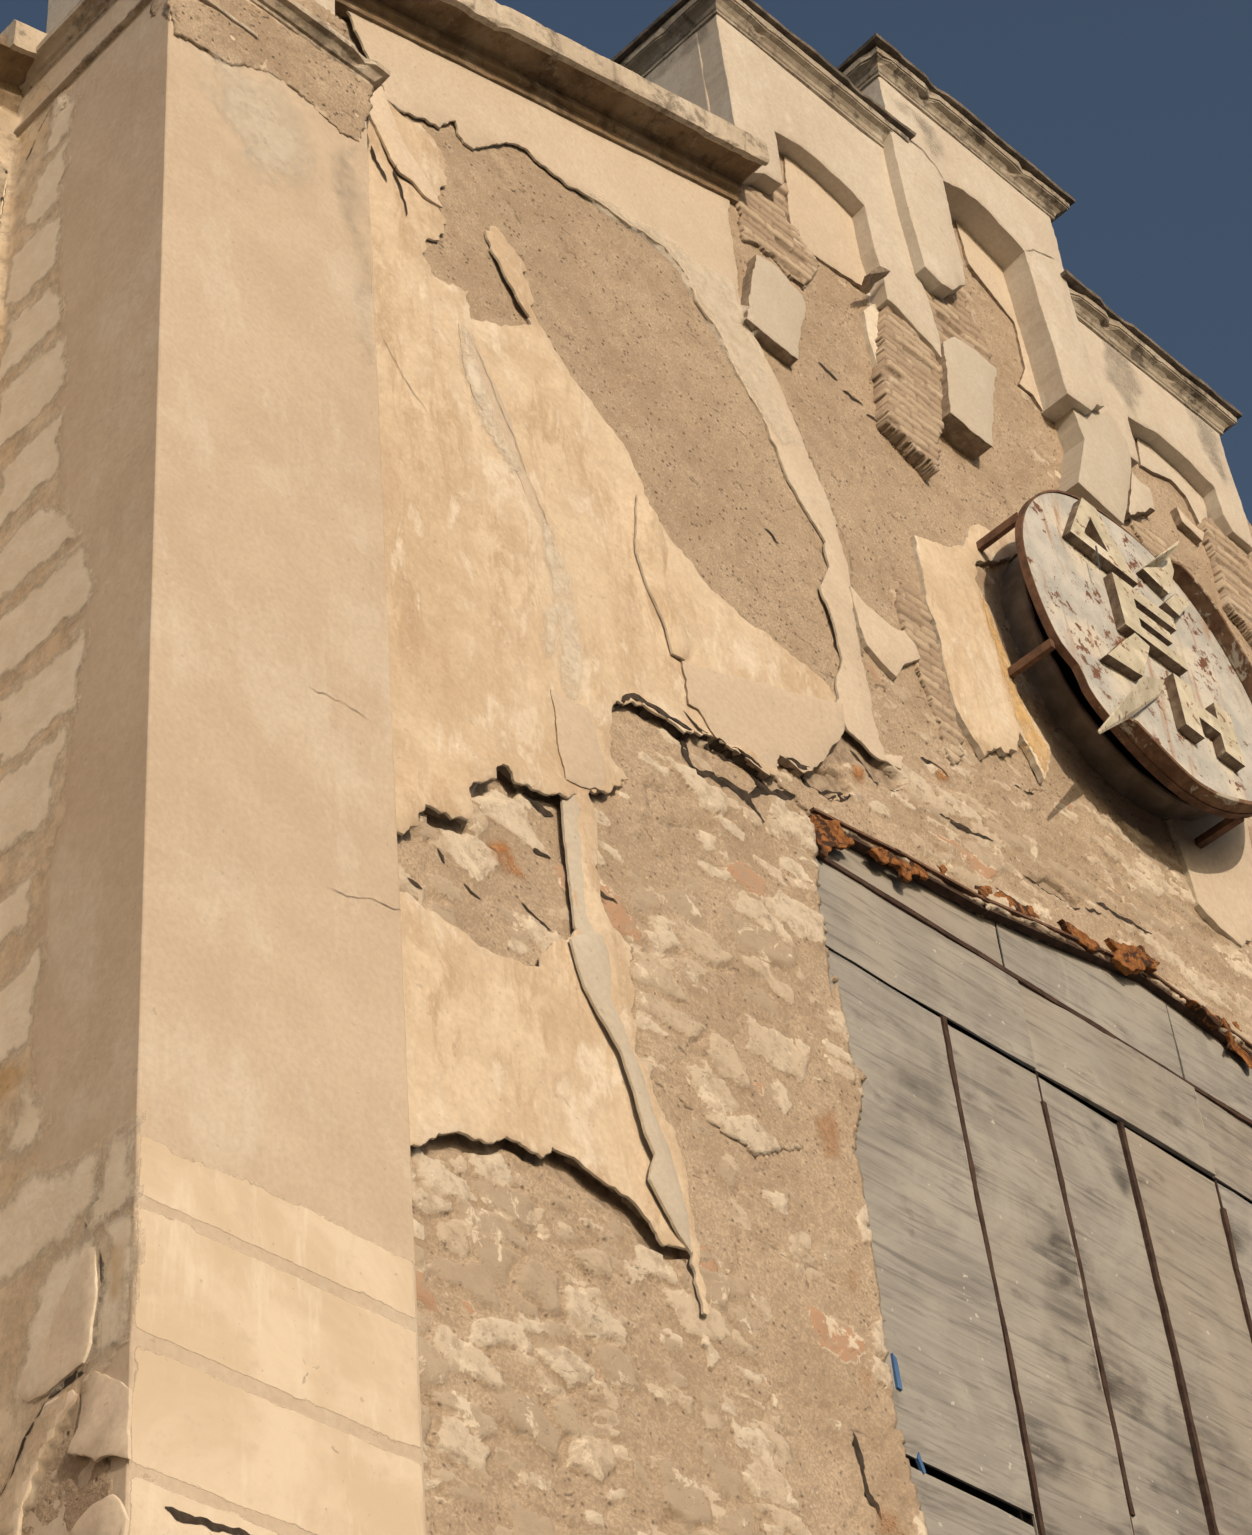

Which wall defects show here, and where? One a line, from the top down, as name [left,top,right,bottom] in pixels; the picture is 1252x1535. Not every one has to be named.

spalling [728,155,1252,1052]
peeling [0,0,928,1535]
corrosion [809,814,947,883]
corrosion [975,885,1160,976]
corrosion [1184,1000,1252,1069]
crack [1,1197,105,1494]